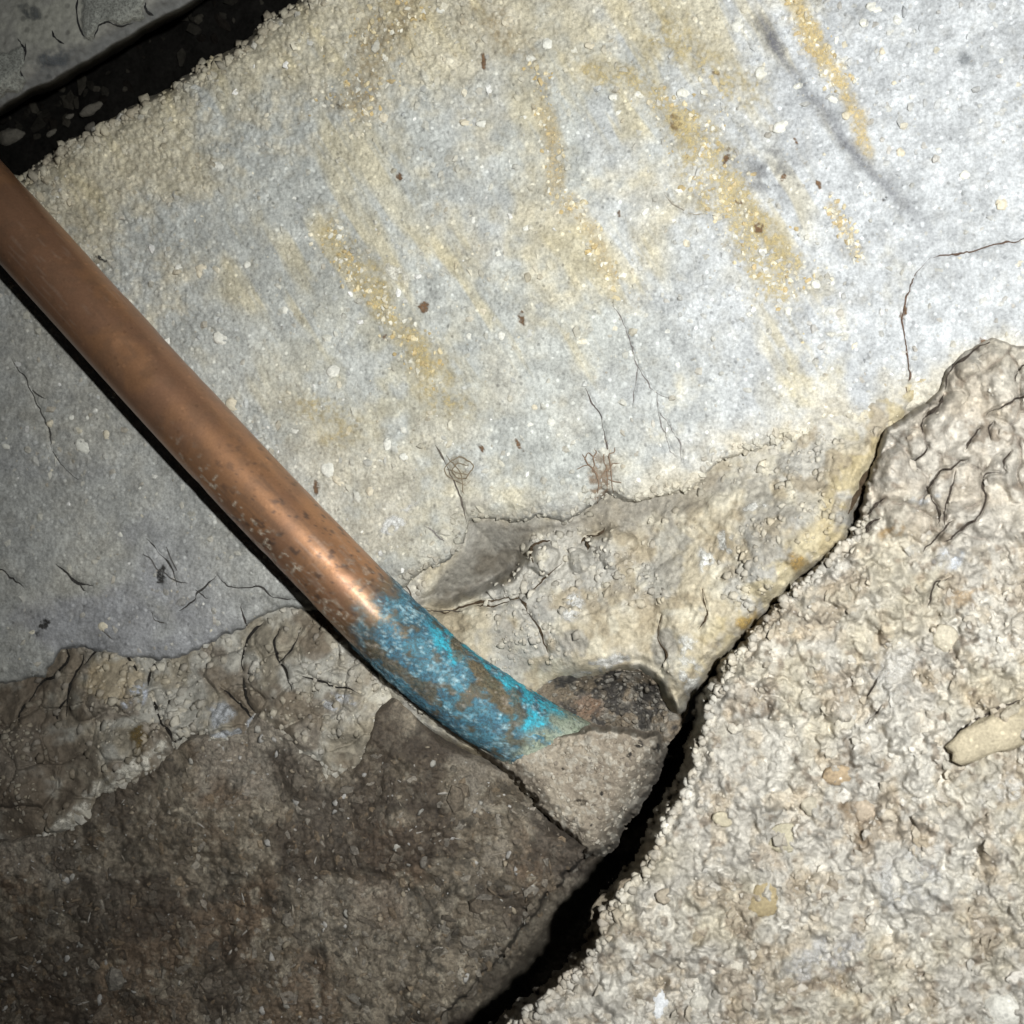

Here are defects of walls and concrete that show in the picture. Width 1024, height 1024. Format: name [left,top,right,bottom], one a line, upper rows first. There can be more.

crack [901,238,1024,392]
crack [585,388,608,456]
crack [914,342,1024,552]
crack [848,455,885,533]
crack [581,528,605,549]
crack [56,564,93,591]
crack [146,538,364,718]
water stain [563,594,584,621]
water stain [582,654,630,674]
crack [657,615,668,669]
crack [865,666,885,725]